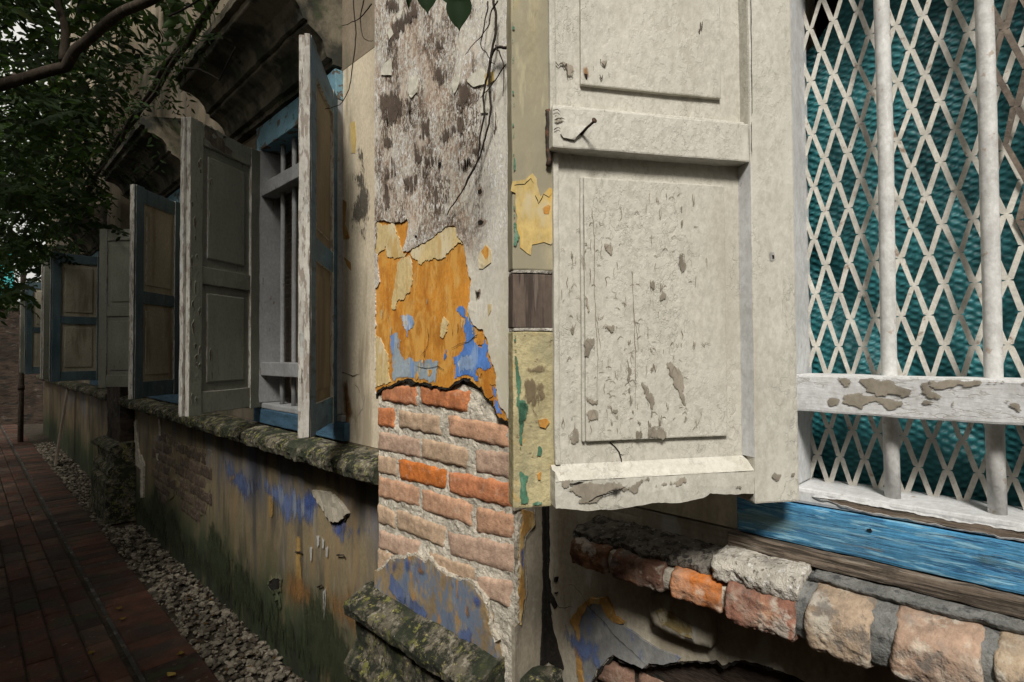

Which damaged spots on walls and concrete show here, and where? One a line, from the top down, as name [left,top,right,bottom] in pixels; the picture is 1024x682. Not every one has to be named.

leakage [382,0,420,67]
leakage [378,67,470,214]
leakage [457,141,484,172]
peeling [511,173,710,444]
peeling [828,377,1005,410]
spalling [175,442,212,523]
spalling [374,222,535,682]
peeling [562,477,687,503]
peeling [565,596,804,682]